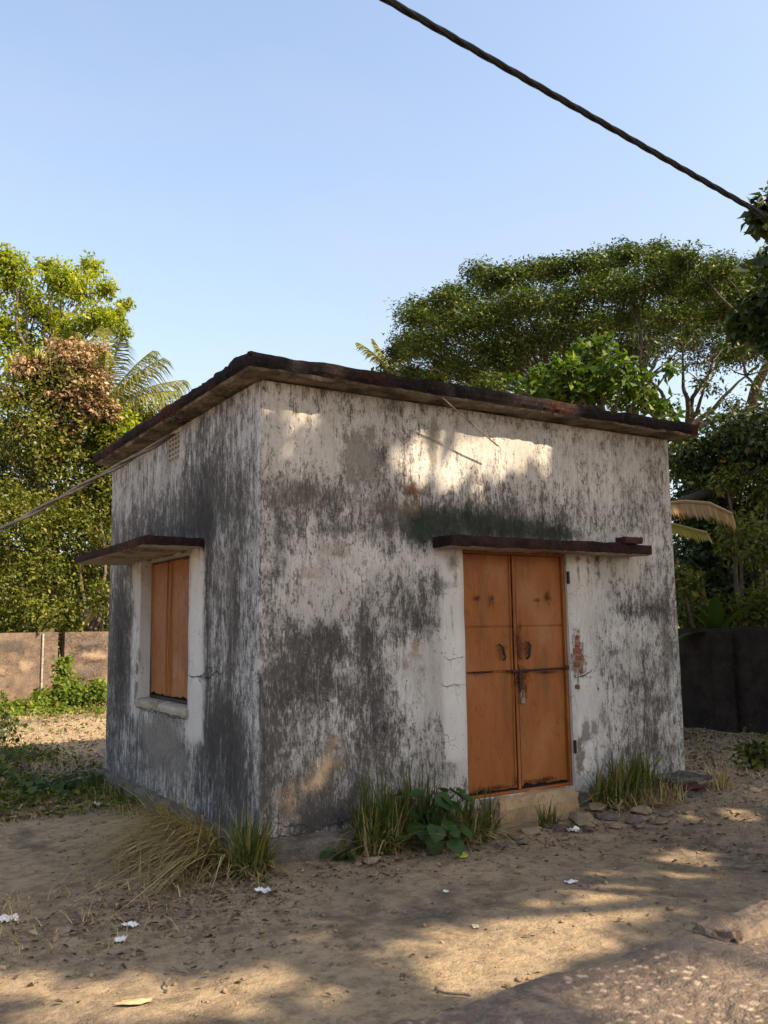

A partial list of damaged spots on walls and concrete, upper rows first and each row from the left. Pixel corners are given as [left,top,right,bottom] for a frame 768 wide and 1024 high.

leakage [422,420,441,469]
flaking render [571,627,590,689]